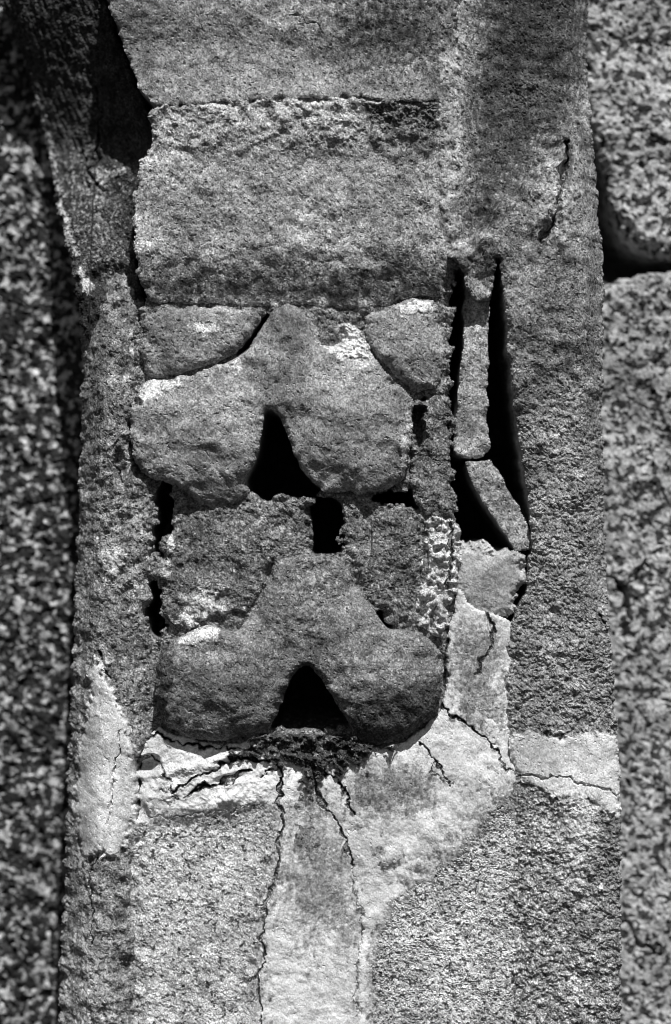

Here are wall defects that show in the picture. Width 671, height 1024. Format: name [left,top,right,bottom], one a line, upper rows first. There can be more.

crack [474,612,496,675]
crack [441,638,509,772]
leakage [139,782,269,818]
crack [147,731,284,880]
crack [316,772,355,836]
leakage [266,611,513,1024]
crack [419,743,450,783]
leakage [556,790,606,894]